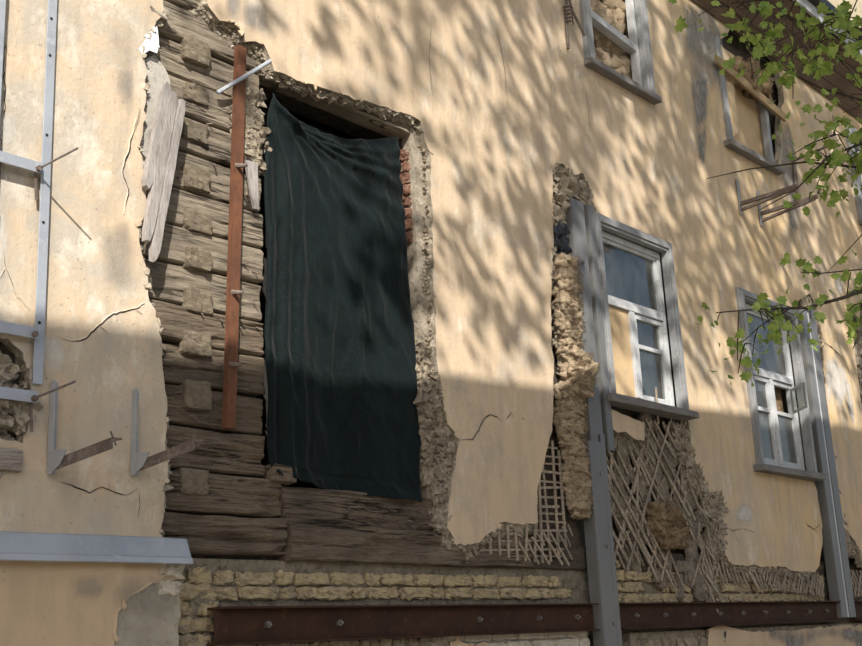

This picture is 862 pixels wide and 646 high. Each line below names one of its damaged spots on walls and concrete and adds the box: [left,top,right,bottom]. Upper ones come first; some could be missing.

flaking render [138,6,170,153]
flaking render [188,3,421,132]
crack [61,302,145,342]
flaking render [415,144,538,561]
peeling [820,351,861,421]
crack [460,413,525,442]
crack [56,480,140,521]
flaking render [663,422,811,580]
spalling [178,566,212,646]
spalling [426,636,492,646]